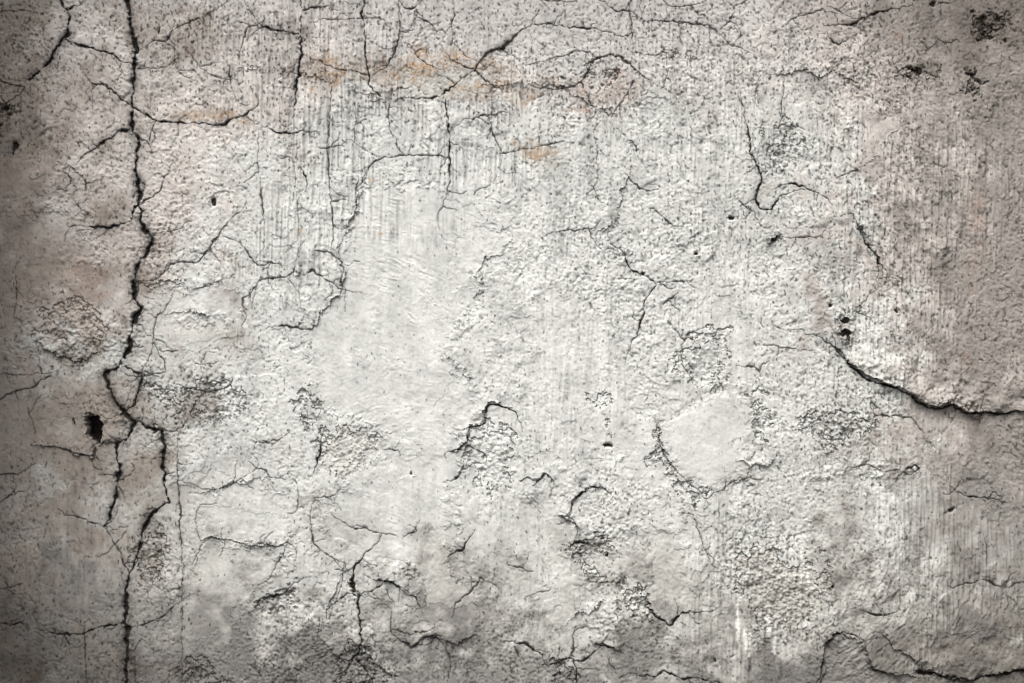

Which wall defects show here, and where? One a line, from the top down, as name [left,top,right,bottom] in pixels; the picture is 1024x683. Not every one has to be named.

crack [739,77,1018,441]
crack [0,0,757,683]
peeling [30,411,138,458]
spalling [139,379,246,436]
crack [820,609,895,678]
crack [868,664,1024,681]